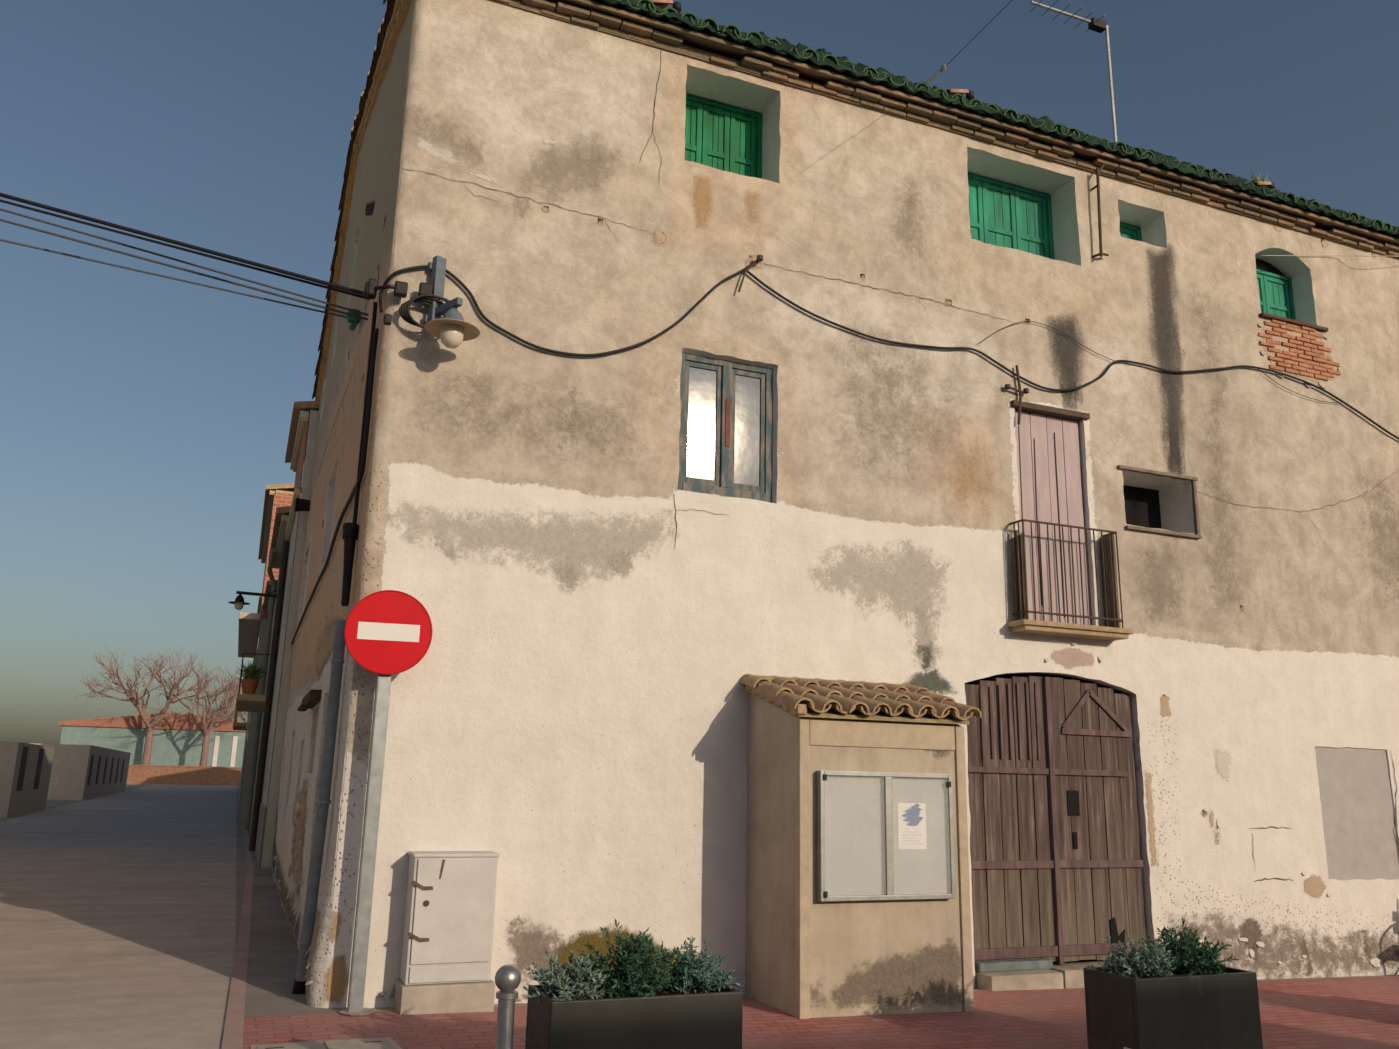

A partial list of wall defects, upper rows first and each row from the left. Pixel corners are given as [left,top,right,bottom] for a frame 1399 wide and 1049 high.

crack [640,49,662,186]
spalling [1258,319,1343,389]
peeling [815,542,948,664]
spalling [1044,640,1104,669]
spalling [272,778,308,946]
spalling [326,957,348,1002]
mould [509,920,565,980]
damp [1242,919,1262,956]